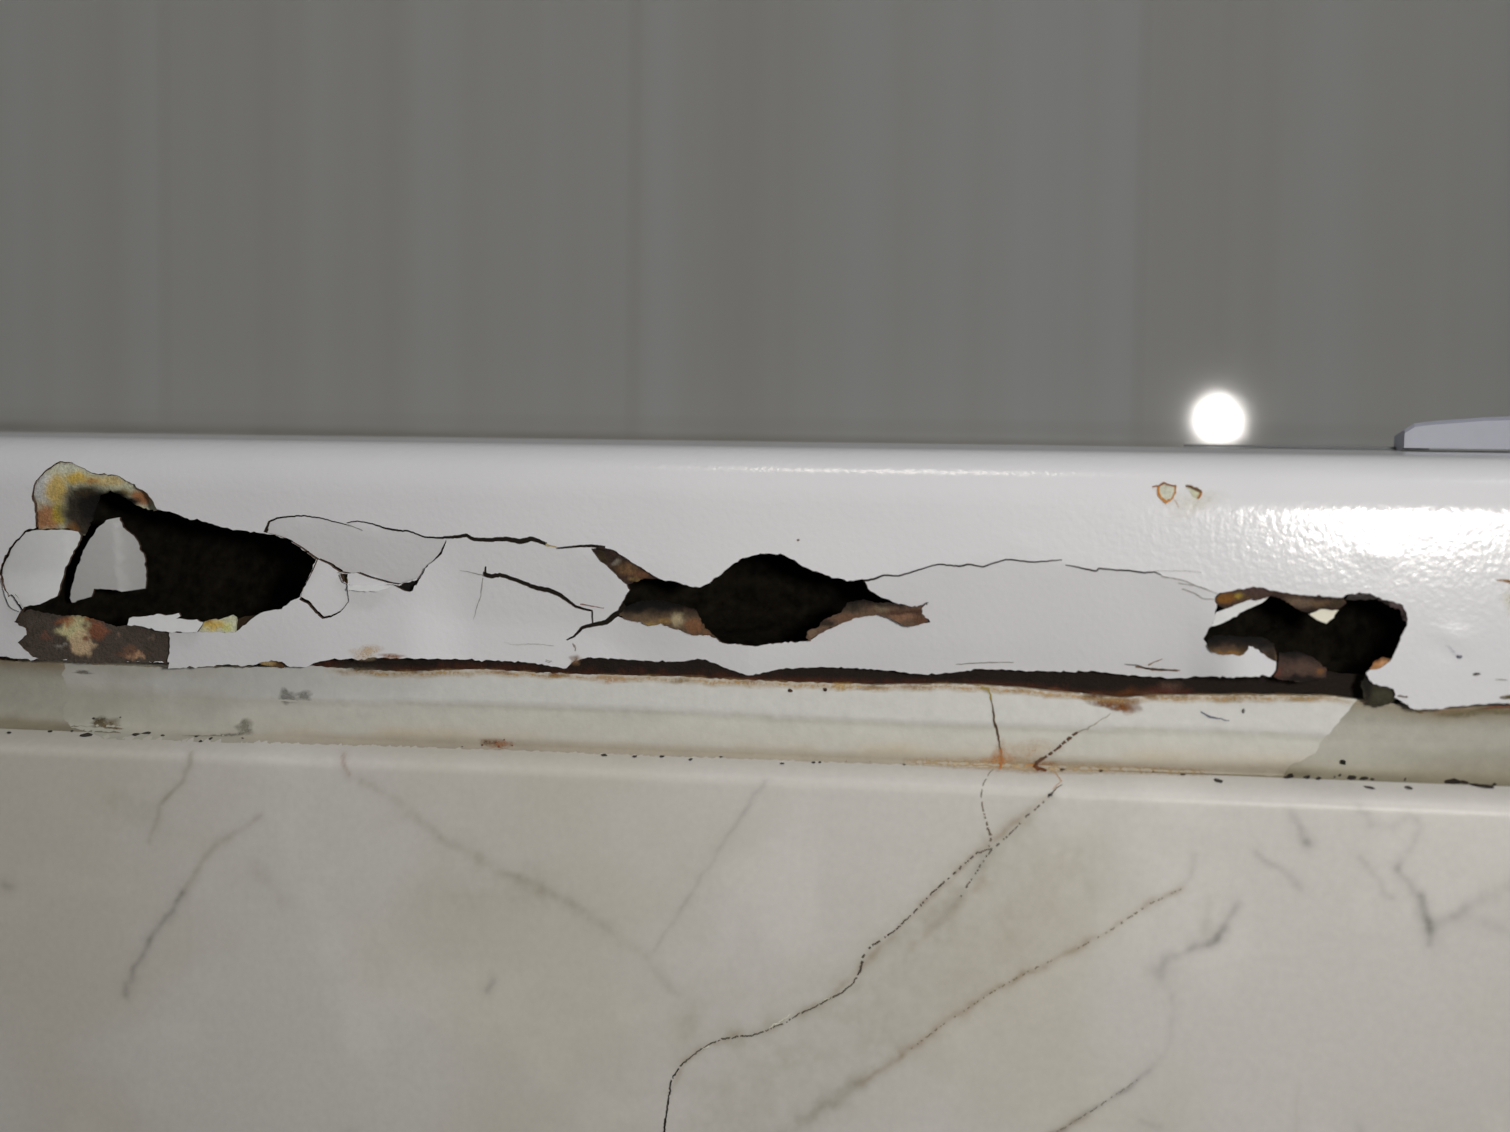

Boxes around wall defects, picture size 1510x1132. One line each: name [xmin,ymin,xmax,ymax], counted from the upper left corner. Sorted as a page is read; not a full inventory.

peeling [1152,482,1202,507]
peeling [0,517,148,612]
corrosion [592,546,659,585]
corrosion [0,609,170,664]
peeling [127,613,204,633]
corrosion [806,599,929,641]
peeling [1212,597,1268,626]
corrosion [1215,587,1407,622]
peeling [1309,609,1338,624]
corrosion [313,635,1423,713]
crack [1125,659,1180,672]
crack [663,662,1111,1132]